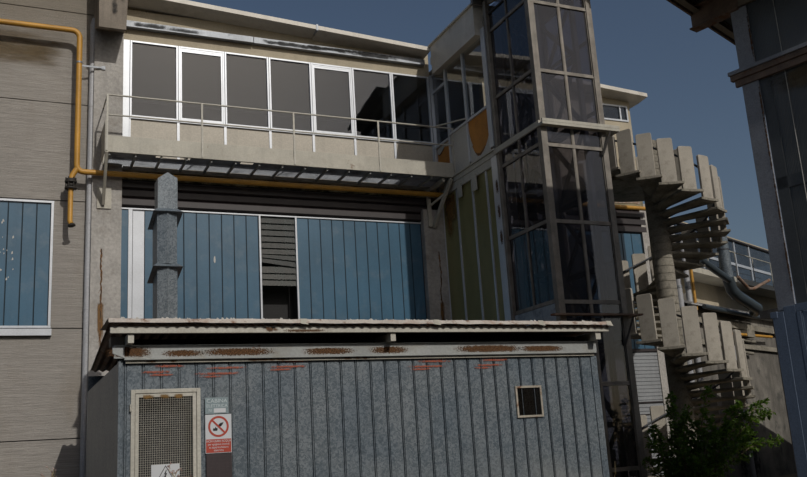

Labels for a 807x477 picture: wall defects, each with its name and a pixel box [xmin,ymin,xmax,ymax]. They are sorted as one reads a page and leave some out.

corrosion [107,347,289,363]
corrosion [305,346,408,359]